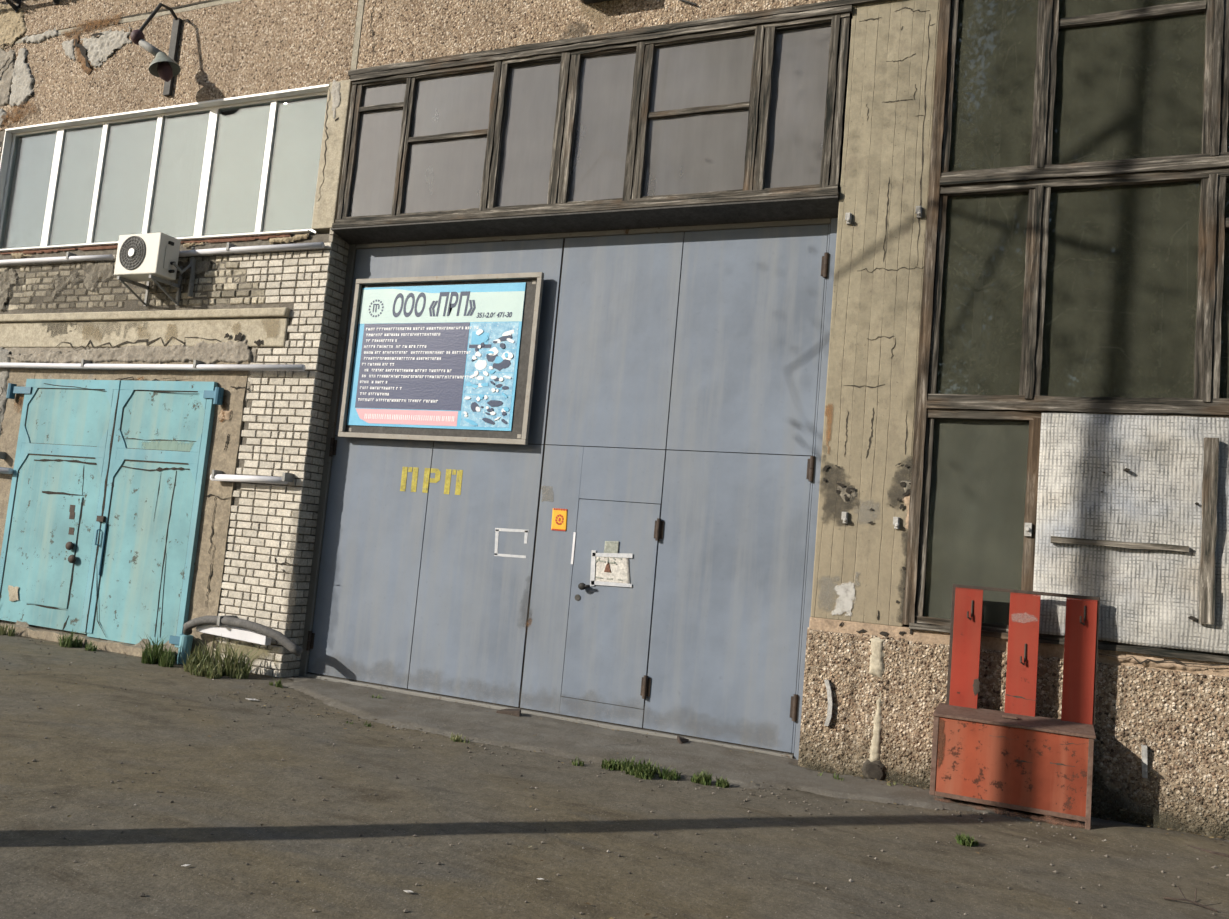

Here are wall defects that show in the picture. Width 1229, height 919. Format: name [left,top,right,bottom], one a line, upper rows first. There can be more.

spalling [0,2,131,128]
crack [859,7,933,273]
spalling [0,268,18,311]
spalling [51,260,115,301]
crack [843,336,896,458]
spalling [820,459,913,529]